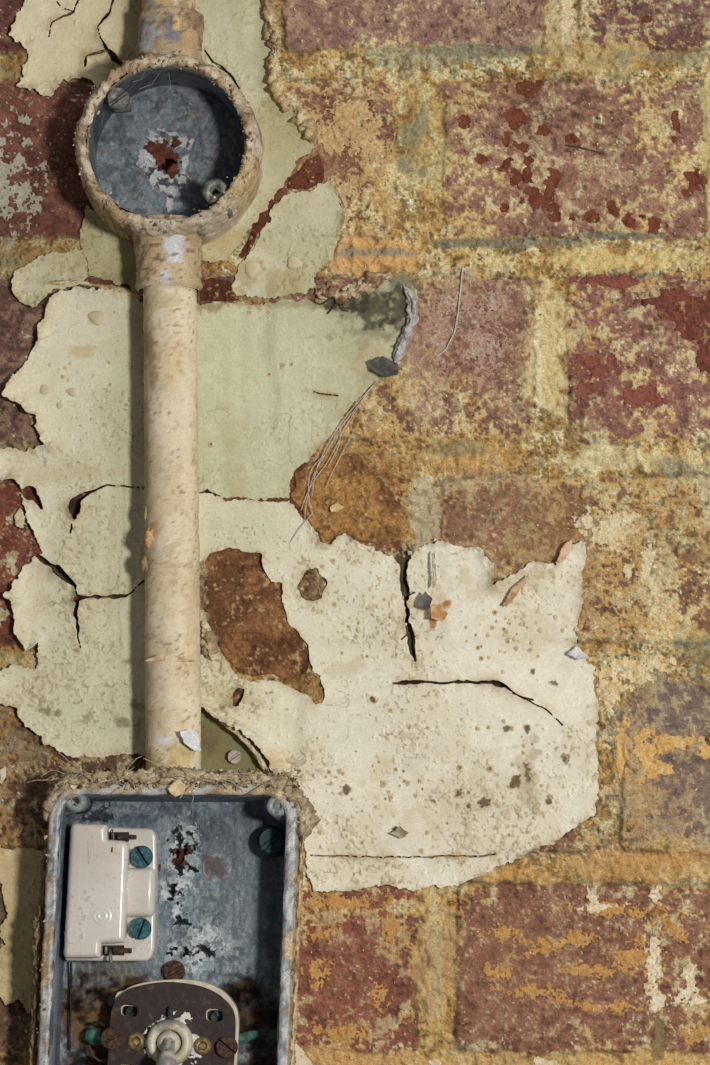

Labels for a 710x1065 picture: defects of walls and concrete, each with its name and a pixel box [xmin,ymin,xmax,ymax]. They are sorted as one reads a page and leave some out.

crack [86,1,121,65]
spalling [474,106,668,235]
spalling [671,110,681,142]
spalling [682,168,708,197]
peeling [0,0,599,892]
crack [25,488,42,509]
crack [68,484,139,531]
crack [37,556,142,648]
crack [395,549,563,726]
peeling [0,845,55,1021]